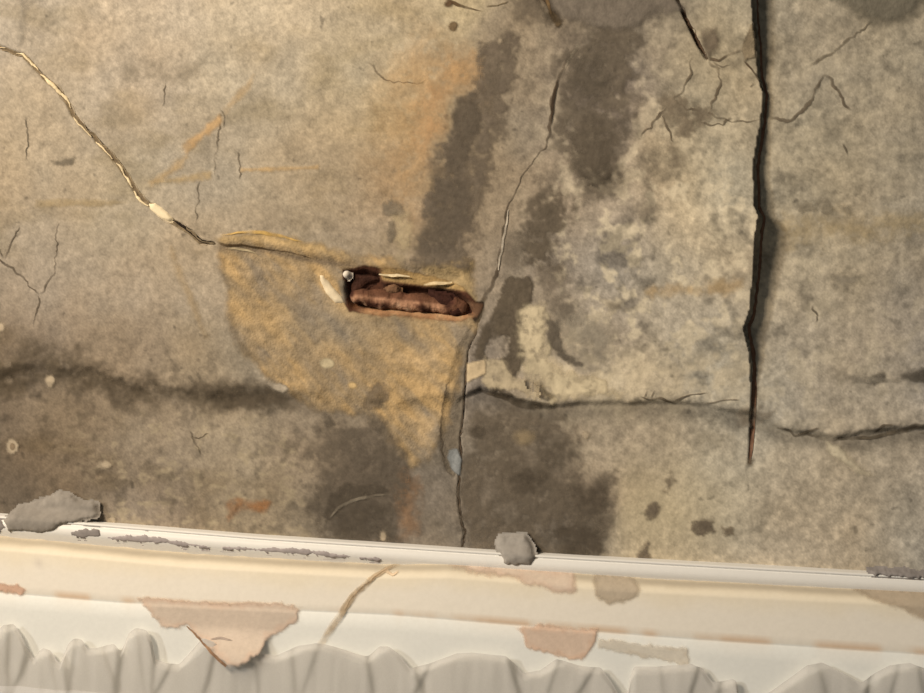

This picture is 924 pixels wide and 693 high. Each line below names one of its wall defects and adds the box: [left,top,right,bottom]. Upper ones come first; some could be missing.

crack [445,0,507,31]
crack [0,46,215,246]
water stain [413,32,518,269]
water stain [550,26,642,197]
crack [0,228,58,319]
crack [440,46,578,547]
water stain [519,193,576,264]
crack [642,0,868,460]
water stain [365,383,388,409]
peeling [0,584,24,595]
peeling [138,597,298,667]
peeling [520,624,688,665]